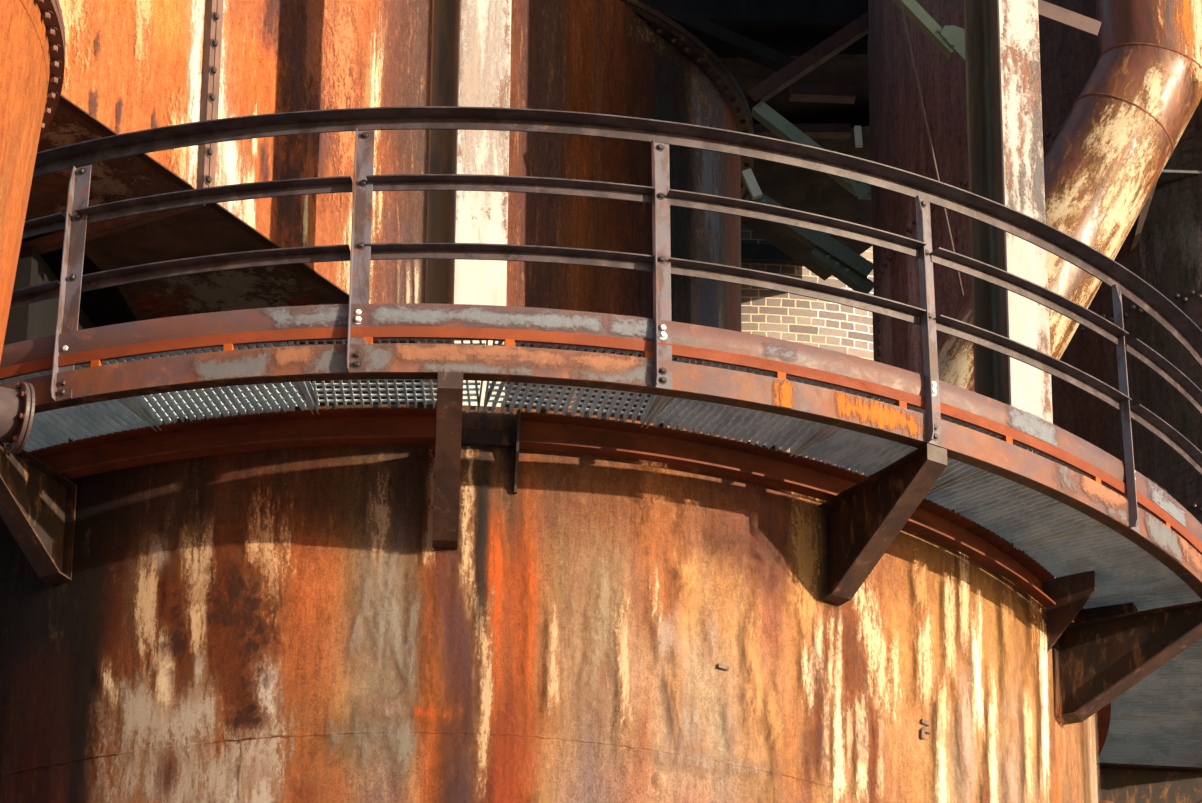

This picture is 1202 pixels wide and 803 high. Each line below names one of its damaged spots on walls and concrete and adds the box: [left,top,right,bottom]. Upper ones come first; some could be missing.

corrosion [59,0,102,96]
corrosion [265,0,367,113]
corrosion [459,0,510,108]
peeling [1006,0,1202,260]
peeling [937,335,974,389]
peeling [1047,251,1062,289]
peeling [1049,310,1079,360]
peeling [1070,276,1102,309]
peeling [96,492,296,803]
corrosion [206,553,284,730]
corrosion [486,509,538,803]
corrosion [808,586,883,803]